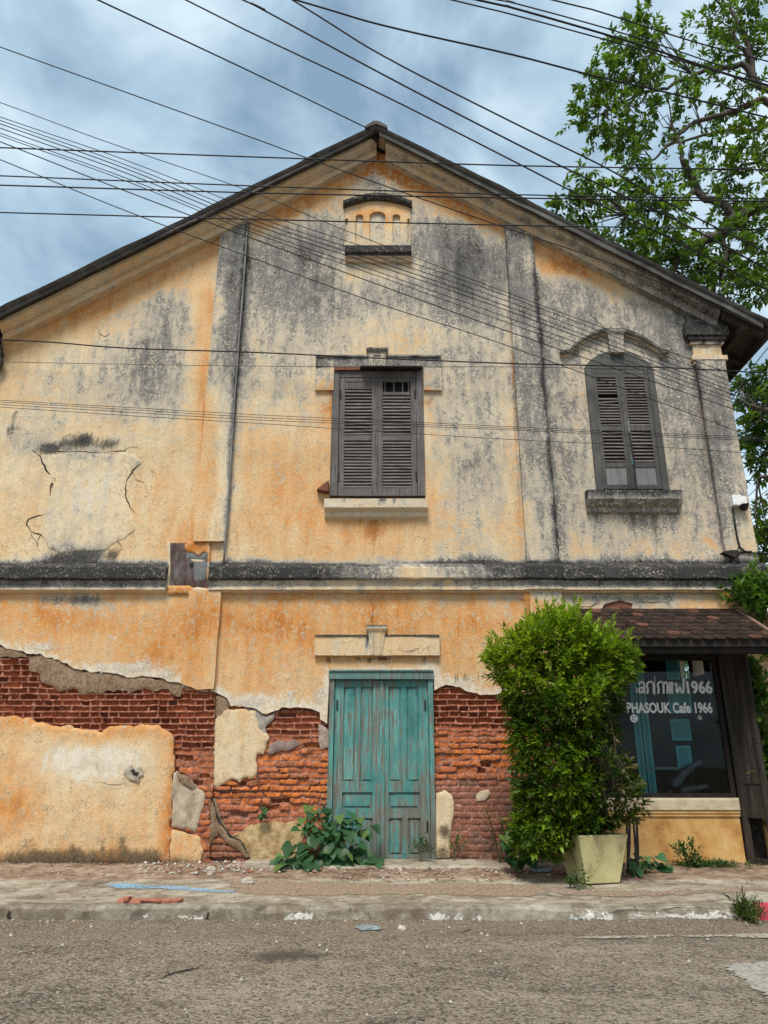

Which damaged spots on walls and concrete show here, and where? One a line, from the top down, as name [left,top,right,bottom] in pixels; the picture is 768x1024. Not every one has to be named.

damp [40,433,114,454]
crack [26,446,143,550]
flaking render [0,645,333,863]
flaking render [433,685,562,863]